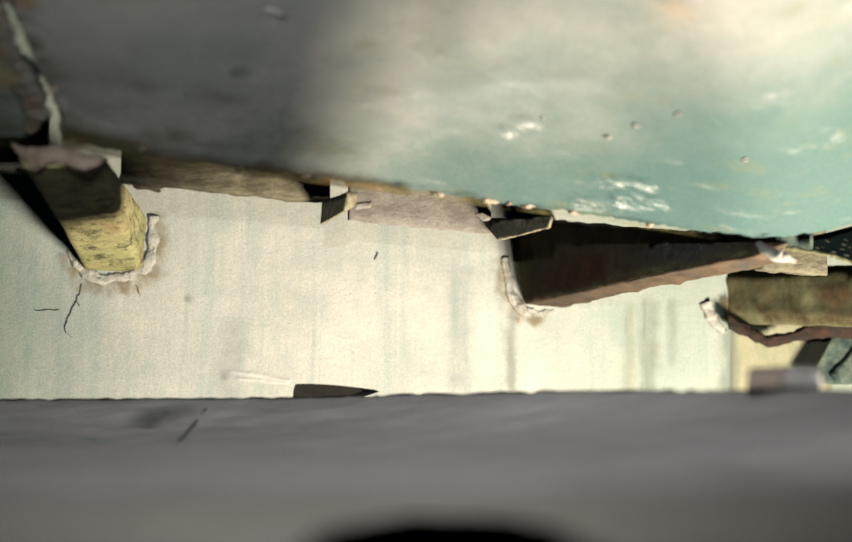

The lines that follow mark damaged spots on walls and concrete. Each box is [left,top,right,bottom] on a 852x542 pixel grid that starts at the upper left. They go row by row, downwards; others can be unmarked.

crack [35,284,83,337]